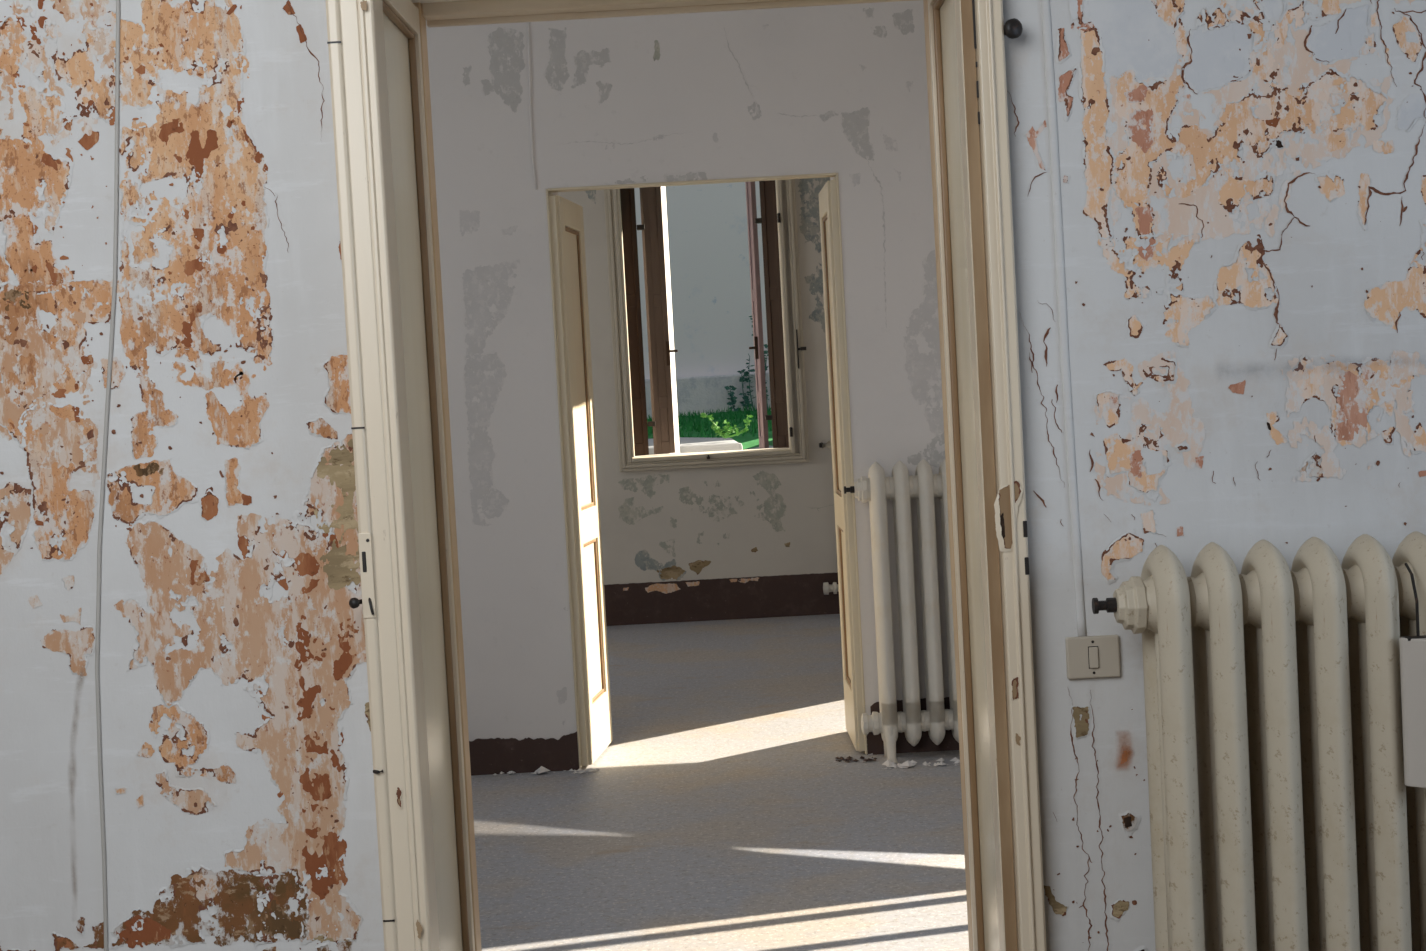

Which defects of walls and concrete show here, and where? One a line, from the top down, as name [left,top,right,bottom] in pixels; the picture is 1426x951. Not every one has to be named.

crack [1181,22,1219,94]
crack [1304,0,1426,231]
crack [1180,171,1214,238]
peeling [1023,0,1426,585]
crack [1261,172,1315,361]
crack [1395,312,1404,333]
peeling [0,0,371,951]
peeling [617,469,790,594]
peeling [1071,705,1091,739]
crack [1053,686,1112,951]
spalling [1118,810,1141,837]
peeling [1044,885,1068,916]